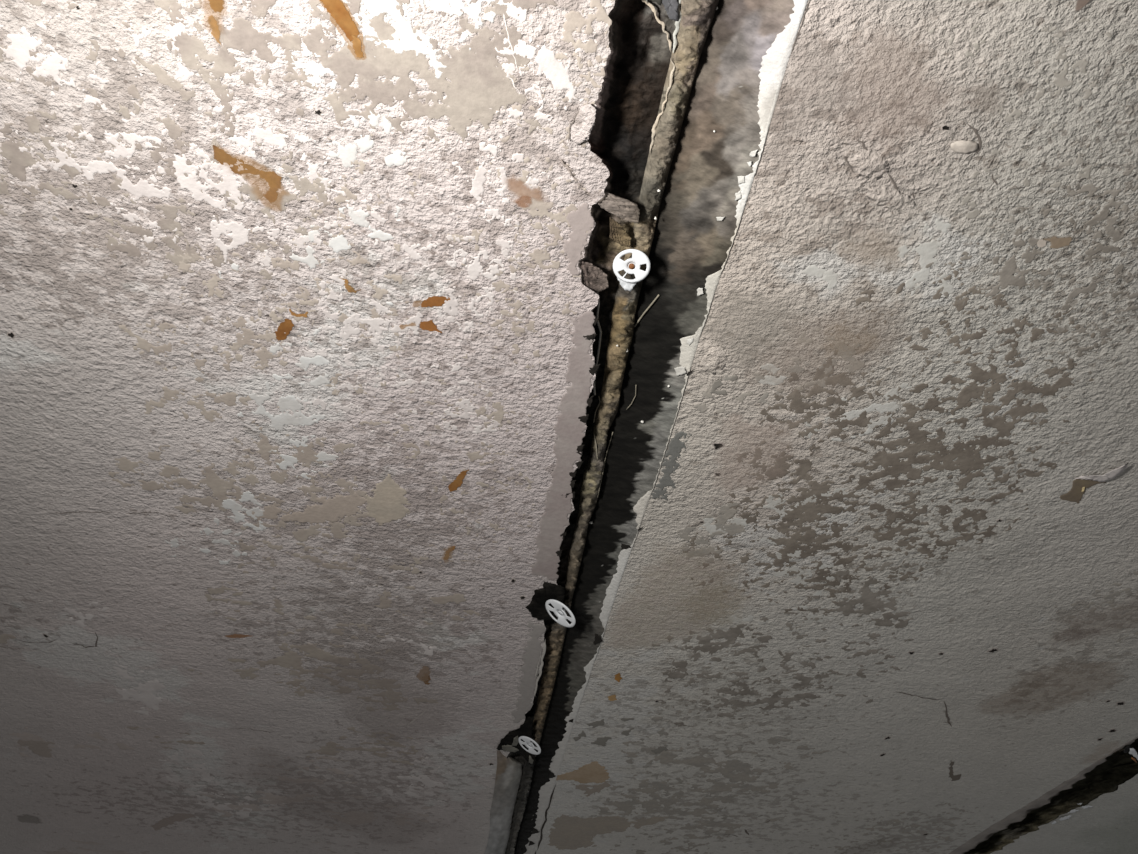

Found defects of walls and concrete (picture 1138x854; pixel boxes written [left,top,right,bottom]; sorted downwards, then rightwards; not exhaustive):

corrosion [208,0,224,45]
corrosion [320,0,363,58]
corrosion [213,145,282,203]
corrosion [275,309,308,341]
corrosion [399,296,450,333]
spalling [0,0,679,854]
peeling [524,0,1138,854]
corrosion [448,470,469,492]